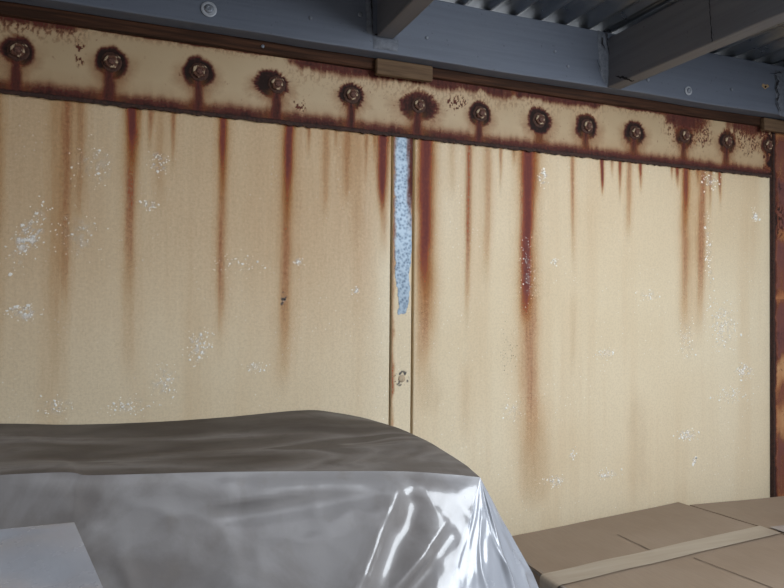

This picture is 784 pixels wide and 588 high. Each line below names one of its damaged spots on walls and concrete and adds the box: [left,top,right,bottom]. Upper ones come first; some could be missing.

rust [0,16,78,36]
rust [0,35,784,497]
peeling [393,136,412,315]